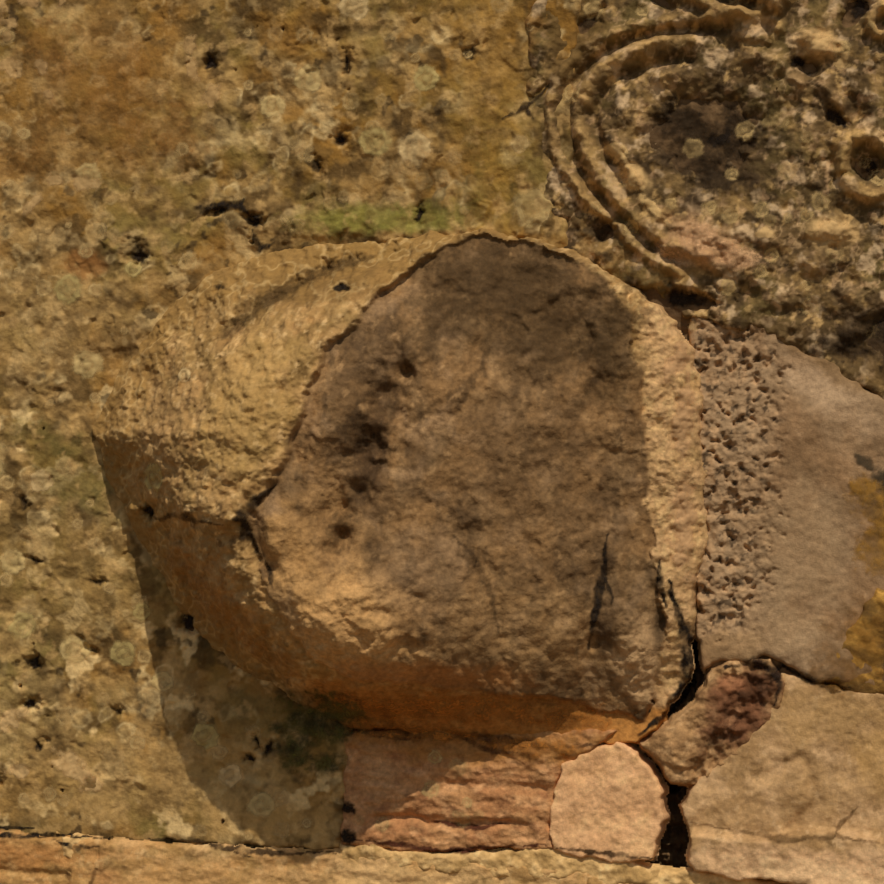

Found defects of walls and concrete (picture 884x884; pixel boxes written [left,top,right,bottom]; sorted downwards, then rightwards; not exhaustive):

crack [153,484,277,584]